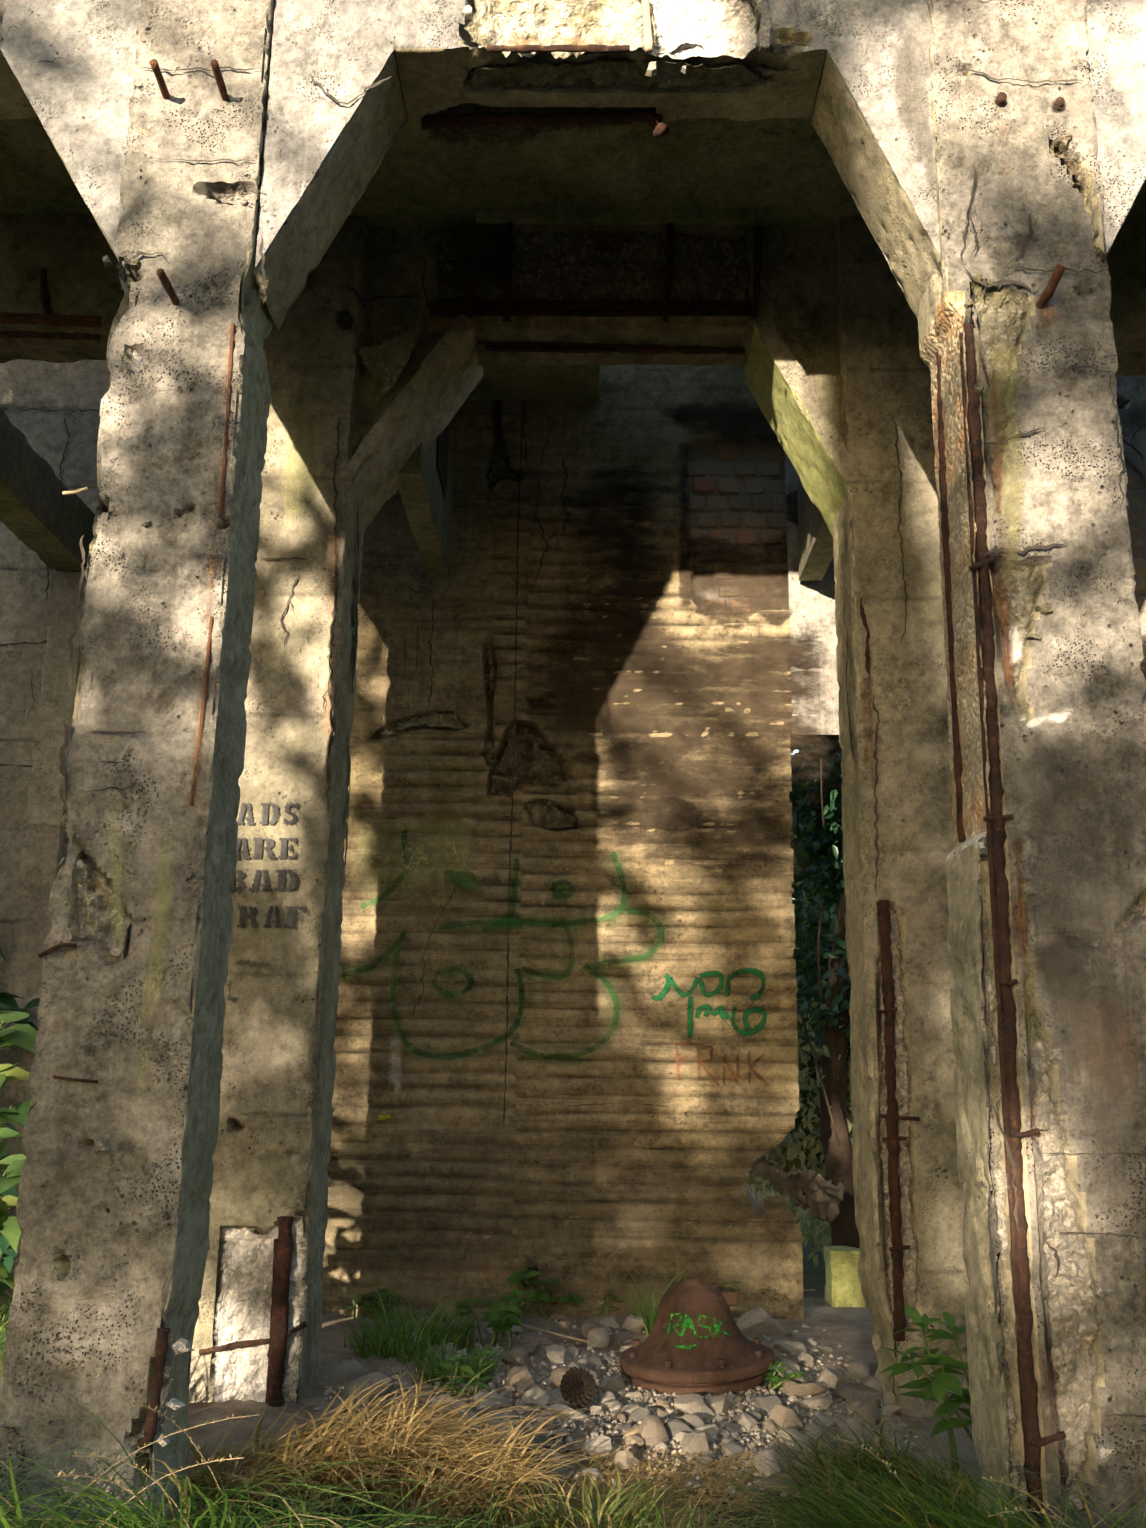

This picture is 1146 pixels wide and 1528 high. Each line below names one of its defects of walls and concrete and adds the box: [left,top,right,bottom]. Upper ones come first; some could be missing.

spalling [462,0,807,90]
spalling [1049,135,1108,262]
leakage [610,482,818,693]
flaking render [684,439,787,611]
rust [998,581,1012,686]
flaking render [1125,462,1146,624]
spalling [212,1216,309,1404]
spalling [136,1337,195,1448]